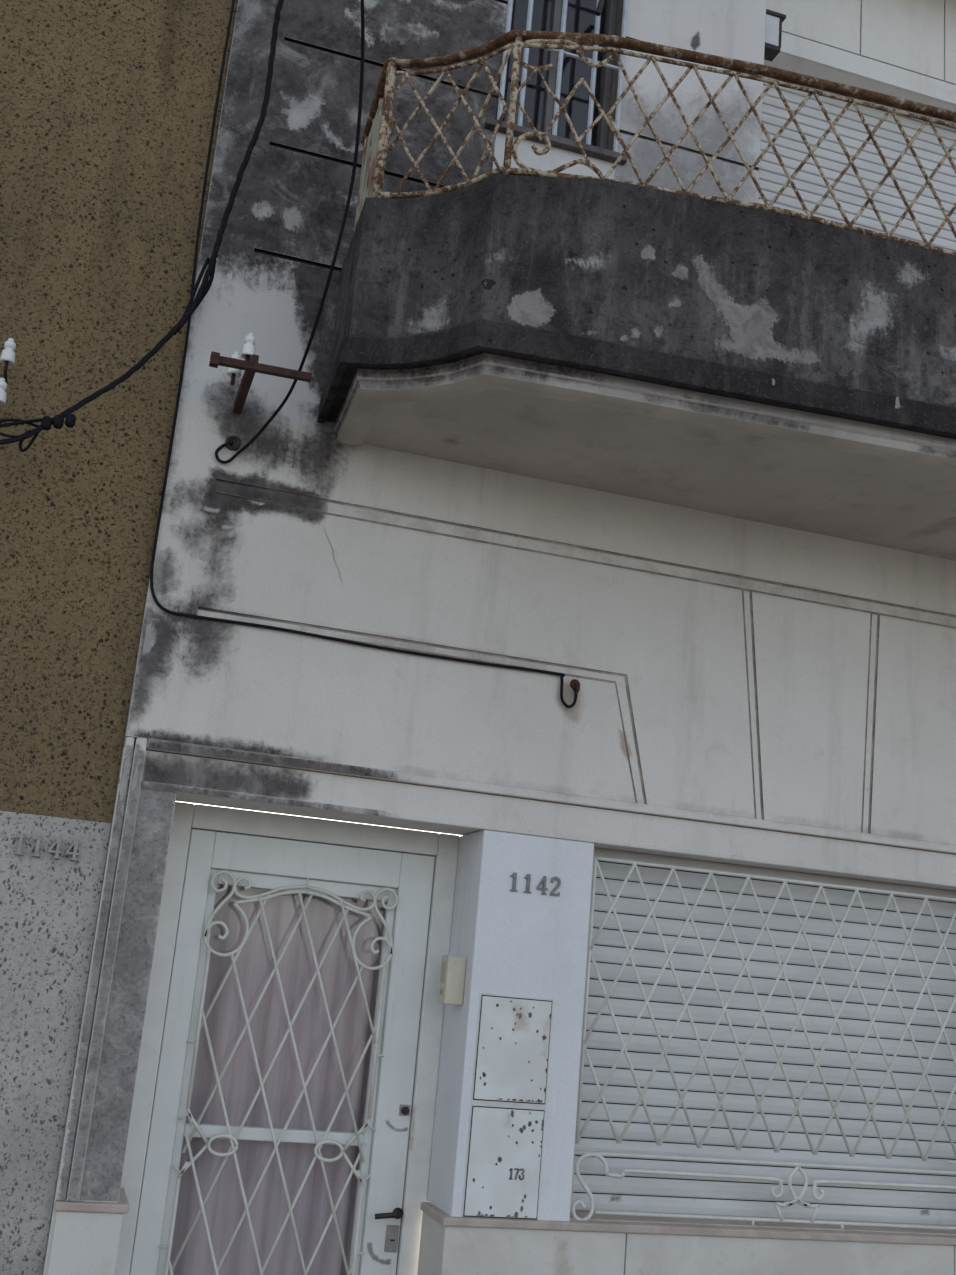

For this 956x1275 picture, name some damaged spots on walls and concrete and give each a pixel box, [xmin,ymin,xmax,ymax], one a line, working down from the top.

leakage [177,0,602,571]
spalling [507,288,556,328]
spalling [620,326,663,342]
spalling [641,245,656,261]
spalling [673,254,819,365]
leakage [130,590,231,714]
leakage [59,731,393,1202]